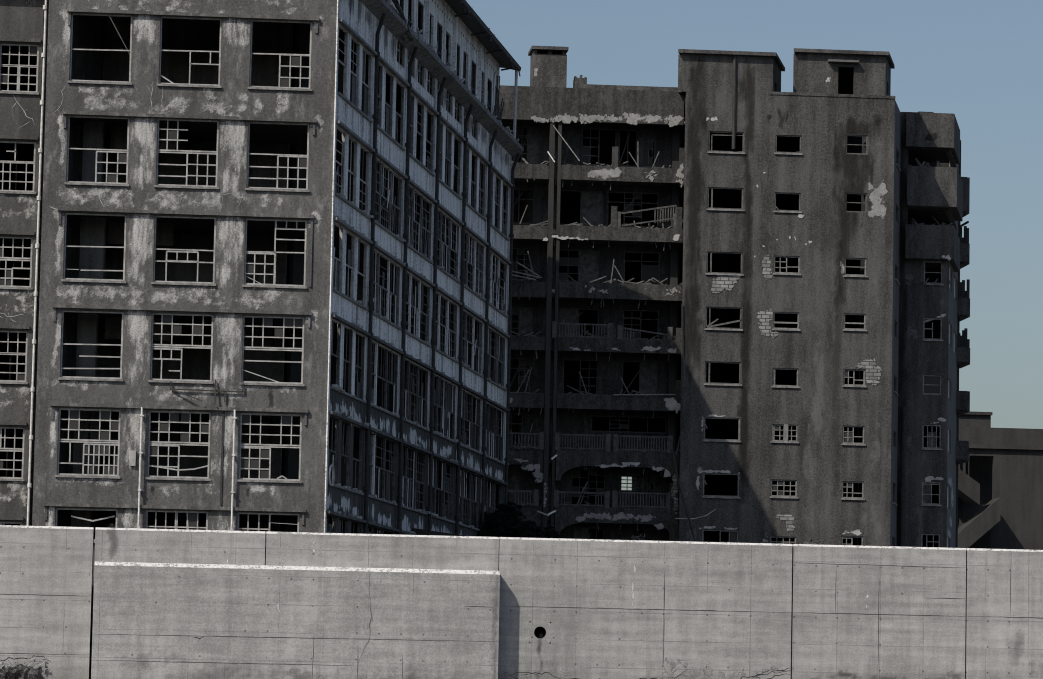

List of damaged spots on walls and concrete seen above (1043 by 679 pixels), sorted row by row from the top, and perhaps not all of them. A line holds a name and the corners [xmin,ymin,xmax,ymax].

spalling [531,112,685,127]
spalling [587,167,622,180]
water stain [684,62,704,366]
water stain [740,70,754,240]
flaking render [868,180,888,219]
flaking render [711,275,741,293]
water stain [738,291,751,478]
water stain [803,315,840,485]
peeling [329,361,548,507]
spalling [327,482,474,536]
crack [499,669,579,679]
crack [740,669,791,679]